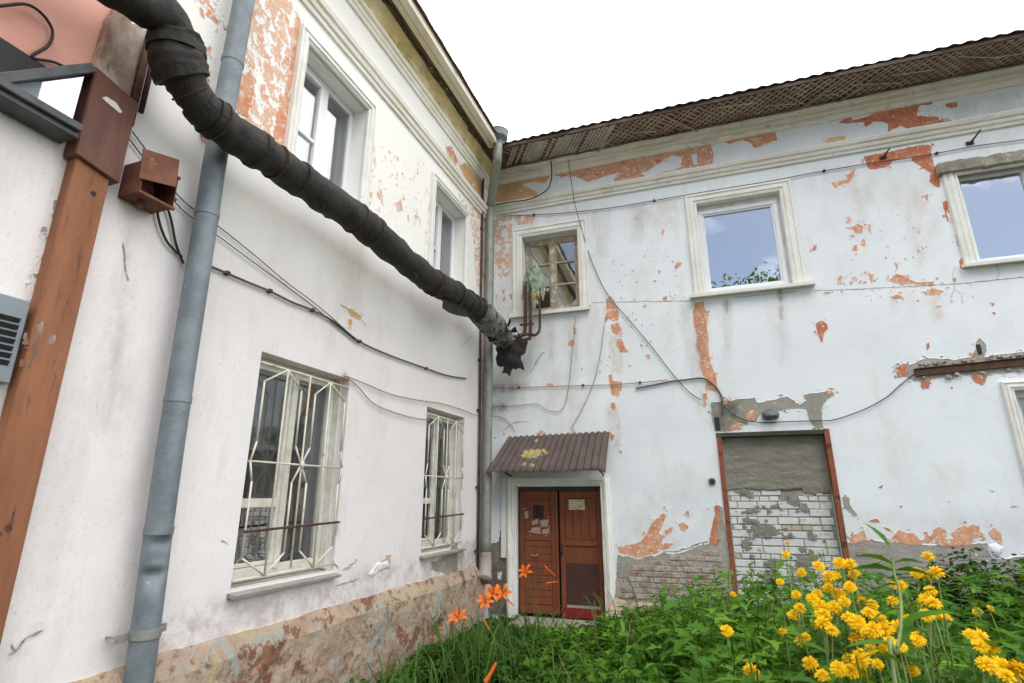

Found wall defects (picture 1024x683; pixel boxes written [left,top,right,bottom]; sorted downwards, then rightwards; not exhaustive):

peeling [236,0,304,145]
peeling [822,102,958,143]
peeling [369,145,430,256]
peeling [445,132,781,311]
peeling [822,142,973,307]
spalling [593,240,839,433]
spalling [891,337,1024,390]
spalling [614,501,733,604]
spalling [840,493,1024,598]